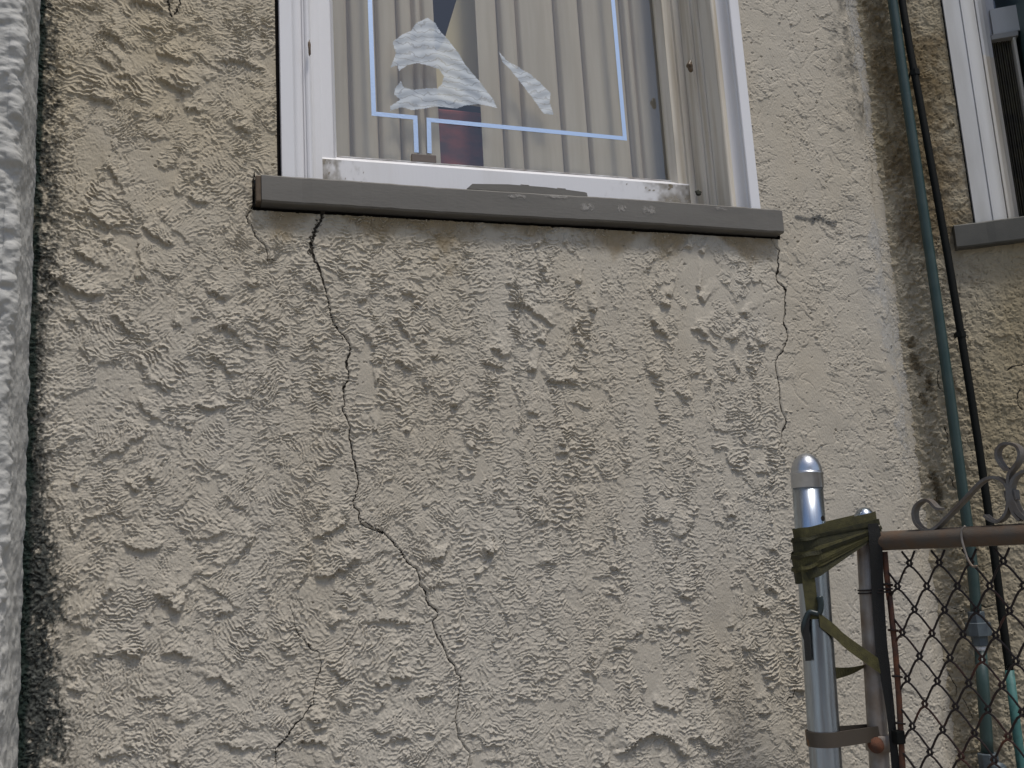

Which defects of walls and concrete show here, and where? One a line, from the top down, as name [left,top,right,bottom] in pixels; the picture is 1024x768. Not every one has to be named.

crack [246,172,277,261]
crack [771,239,788,451]
crack [307,211,471,766]
crack [266,599,322,765]